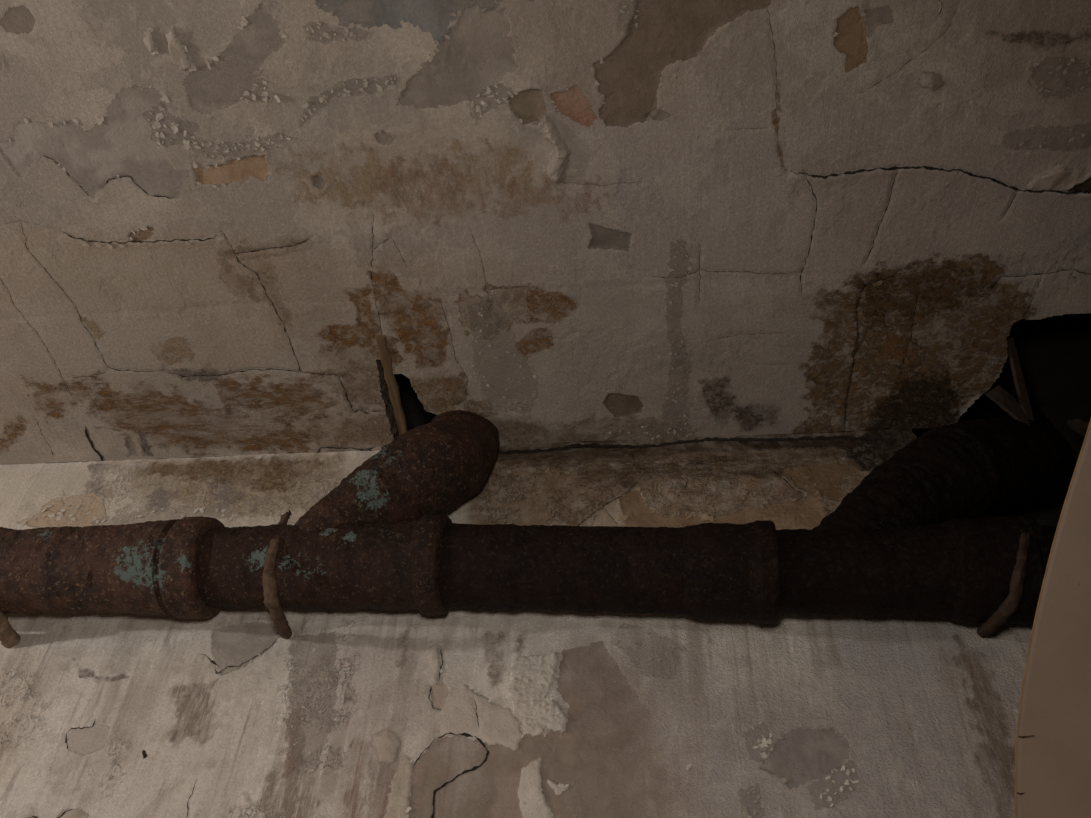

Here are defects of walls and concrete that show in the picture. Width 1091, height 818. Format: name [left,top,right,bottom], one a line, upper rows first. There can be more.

flaking render [301,0,771,128]
flaking render [833,4,893,73]
flaking render [148,105,291,188]
crack [0,220,386,416]
crack [498,0,1091,526]
damp [740,254,1035,450]
crack [85,426,104,461]
crack [317,445,376,453]
peeling [58,808,89,818]
crack [413,650,489,818]
peeling [383,641,632,818]
peeling [820,765,860,807]